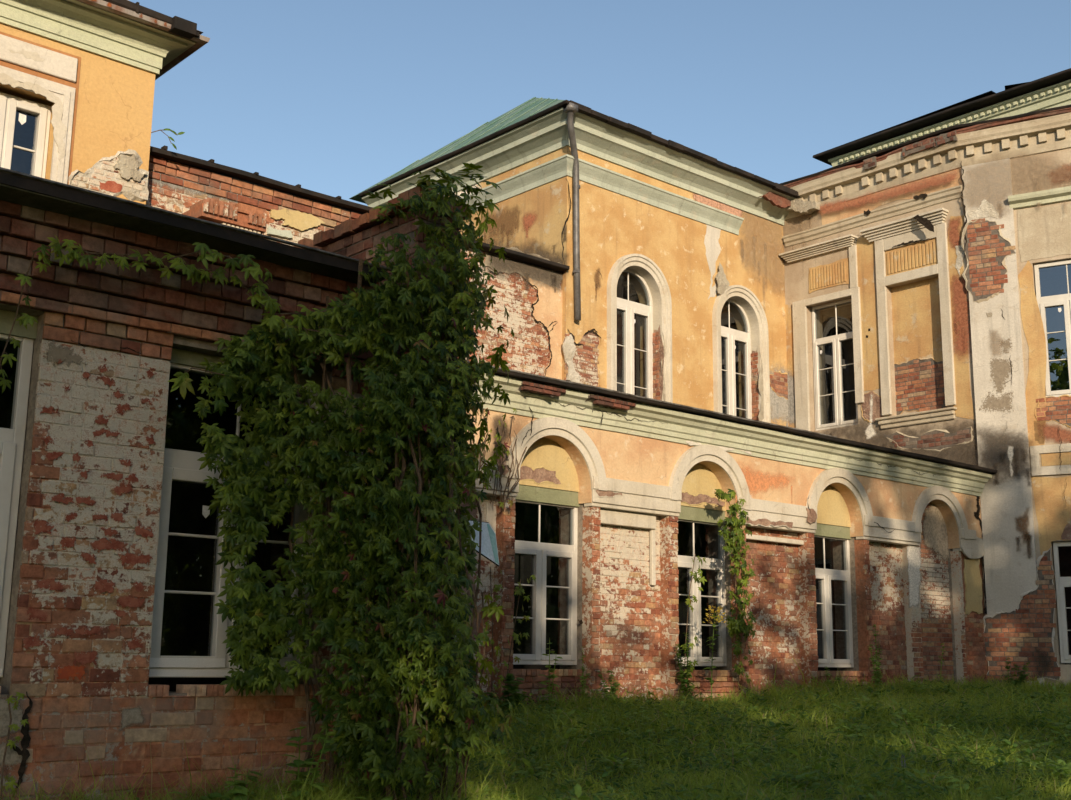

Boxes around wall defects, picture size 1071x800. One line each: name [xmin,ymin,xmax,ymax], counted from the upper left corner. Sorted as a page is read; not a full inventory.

flaking render [68,149,149,202]
crack [959,161,967,261]
flaking render [948,218,1016,353]
peeling [41,340,153,496]
flaking render [519,331,636,410]
flaking render [645,325,666,401]
flaking render [861,390,882,423]
flaking render [894,357,947,415]
flaking render [1034,394,1071,443]
peeling [33,493,154,566]
peeling [22,578,145,651]
flaking render [983,523,1071,683]